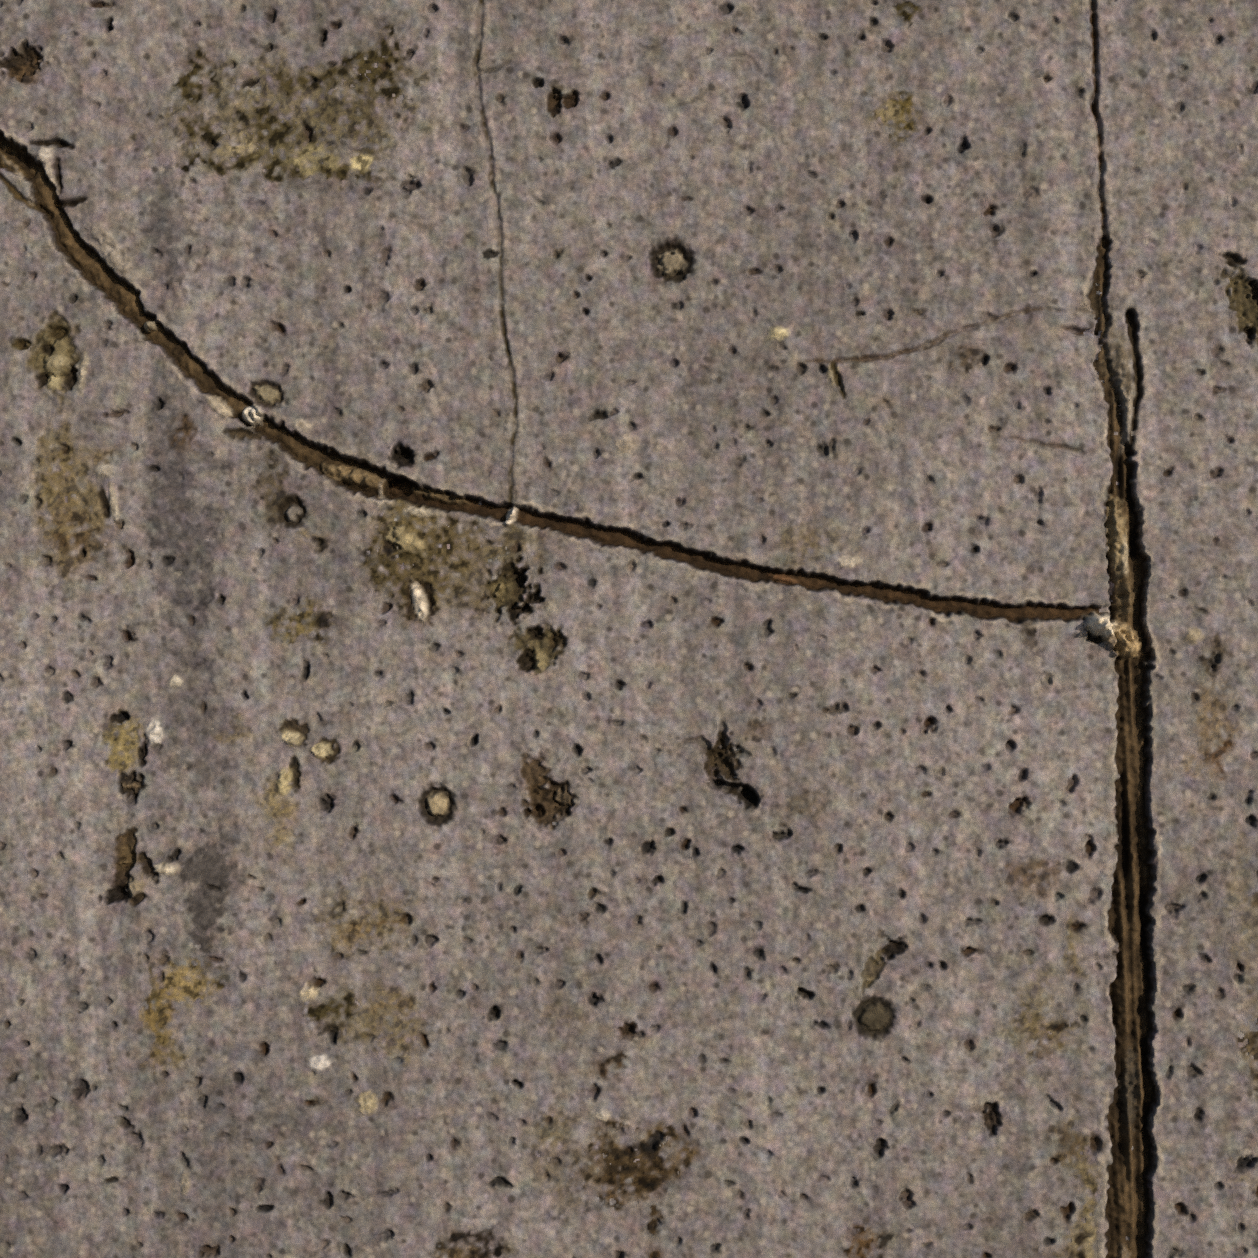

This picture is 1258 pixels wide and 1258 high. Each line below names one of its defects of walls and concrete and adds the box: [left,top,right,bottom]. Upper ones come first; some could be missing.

crack [0,0,1102,631]
crack [801,0,1166,1258]